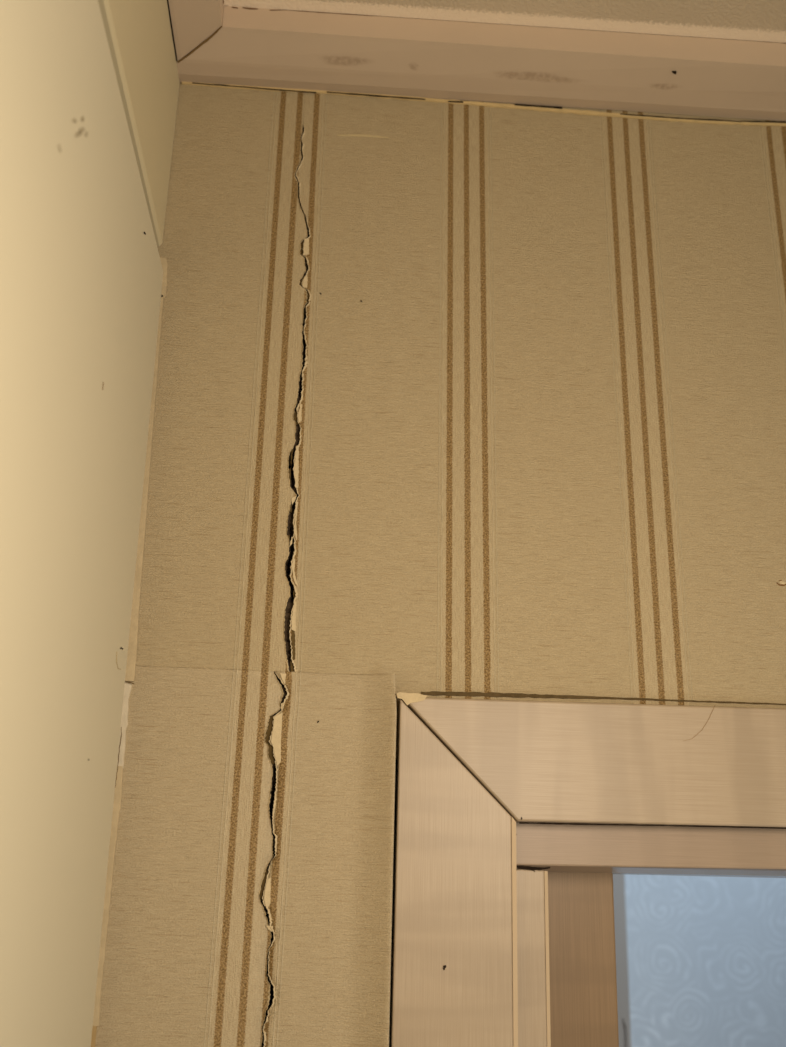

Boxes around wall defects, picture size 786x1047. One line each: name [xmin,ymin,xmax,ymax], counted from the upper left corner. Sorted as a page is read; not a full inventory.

crack [258,125,312,1047]